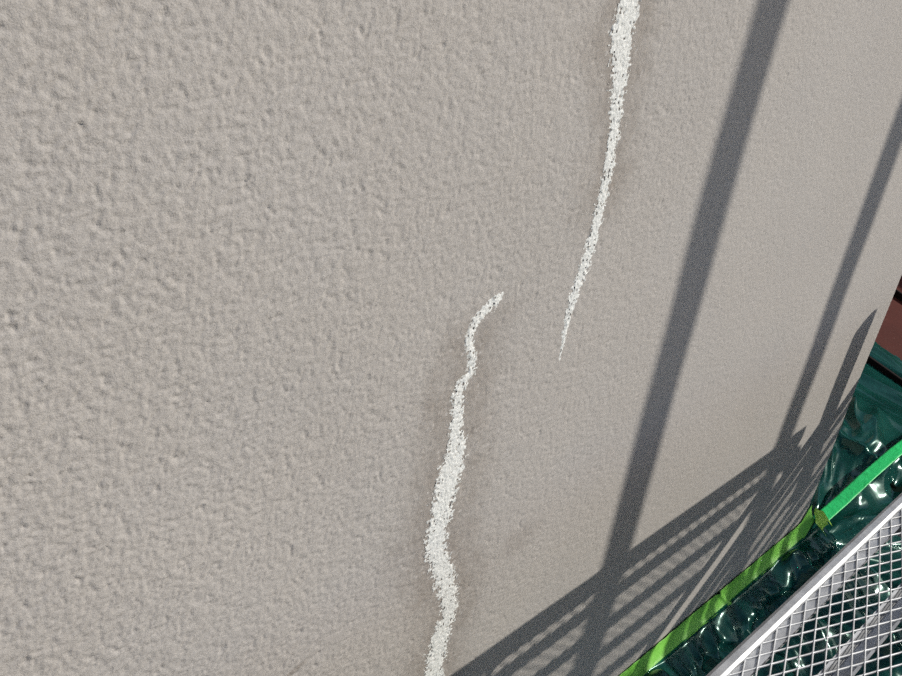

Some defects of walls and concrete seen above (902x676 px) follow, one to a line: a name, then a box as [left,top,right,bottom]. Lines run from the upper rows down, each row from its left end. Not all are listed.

crack [559,0,642,360]
crack [422,292,505,676]